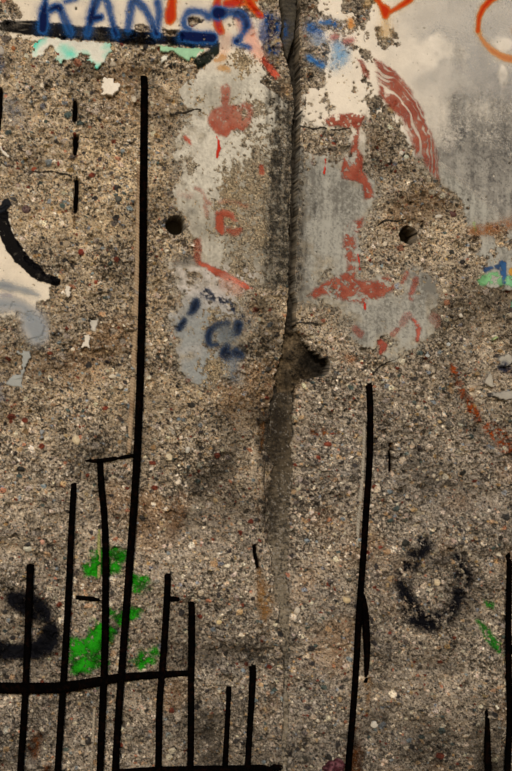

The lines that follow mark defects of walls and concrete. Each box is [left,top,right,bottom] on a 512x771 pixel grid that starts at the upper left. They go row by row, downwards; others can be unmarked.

spalling [295,0,376,118]
spalling [374,26,401,51]
crack [300,124,350,132]
spalling [0,0,330,771]
crack [263,413,271,556]
spalling [286,89,512,771]
corrosion [450,364,512,453]